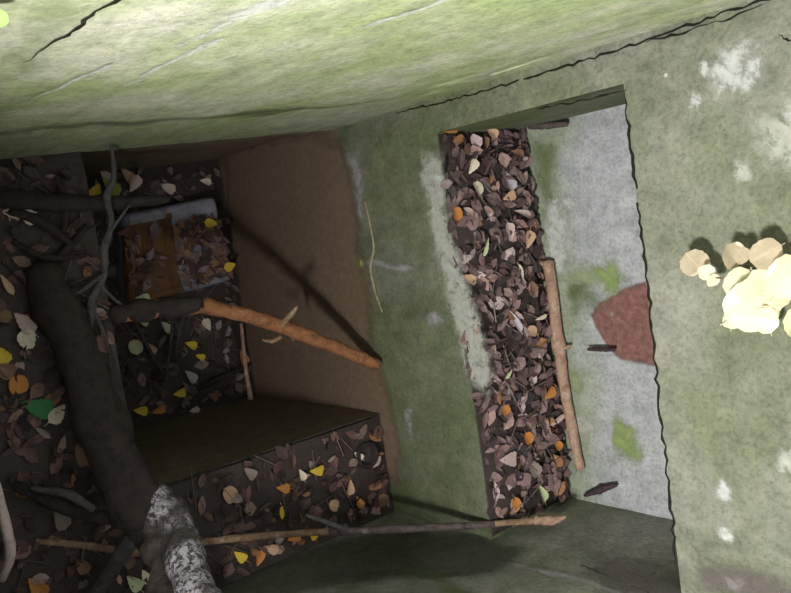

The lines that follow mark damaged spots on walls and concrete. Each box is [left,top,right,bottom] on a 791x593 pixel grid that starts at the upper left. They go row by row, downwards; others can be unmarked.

crack [23,0,121,63]
crack [397,0,770,114]